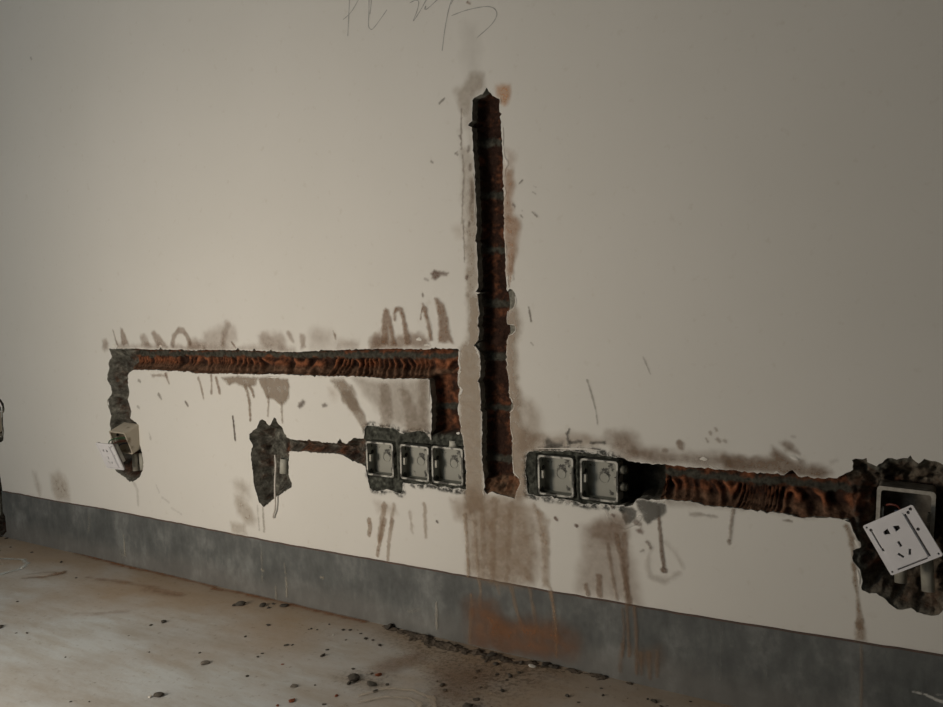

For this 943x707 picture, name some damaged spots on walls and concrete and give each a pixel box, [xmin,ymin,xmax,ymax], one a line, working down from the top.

leakage [375,299,452,346]
hole [846,455,943,615]